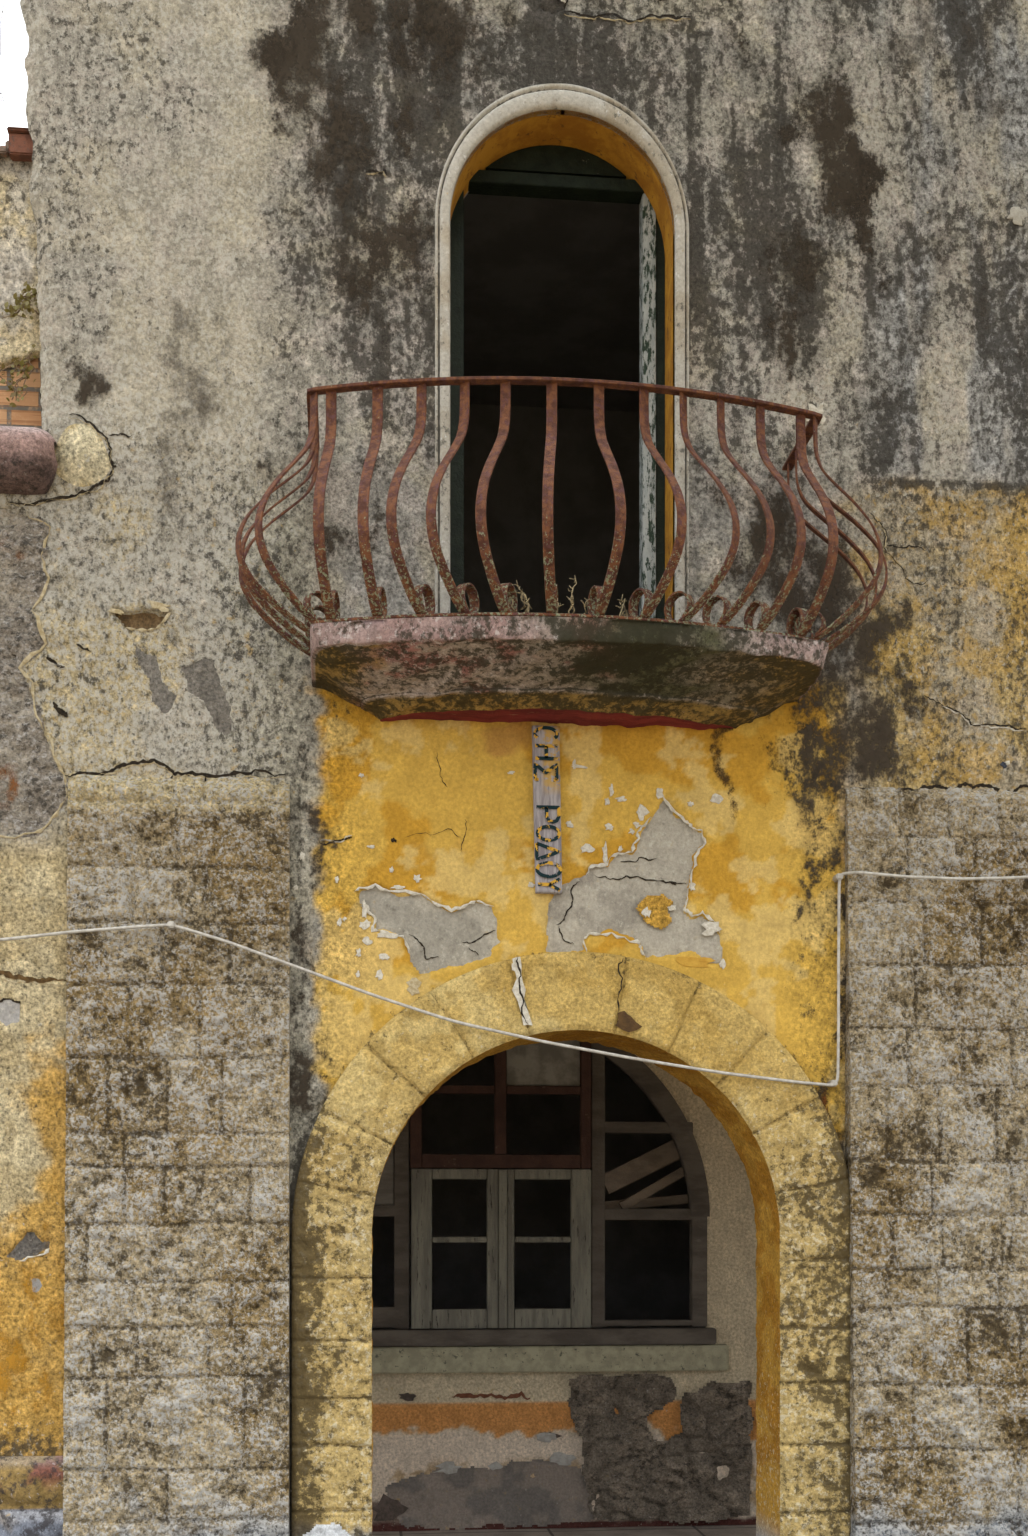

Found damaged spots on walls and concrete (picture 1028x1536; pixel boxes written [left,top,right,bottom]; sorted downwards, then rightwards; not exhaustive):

crack [563,0,691,24]
leakage [248,0,516,330]
leakage [757,59,912,383]
leakage [45,334,112,406]
leakage [709,465,928,921]
crack [65,759,285,781]
crack [0,970,66,986]
peeling [335,866,500,996]
spalling [615,960,642,1032]
peeling [546,784,726,969]
flaking render [372,1372,754,1530]
peeling [303,1523,351,1536]